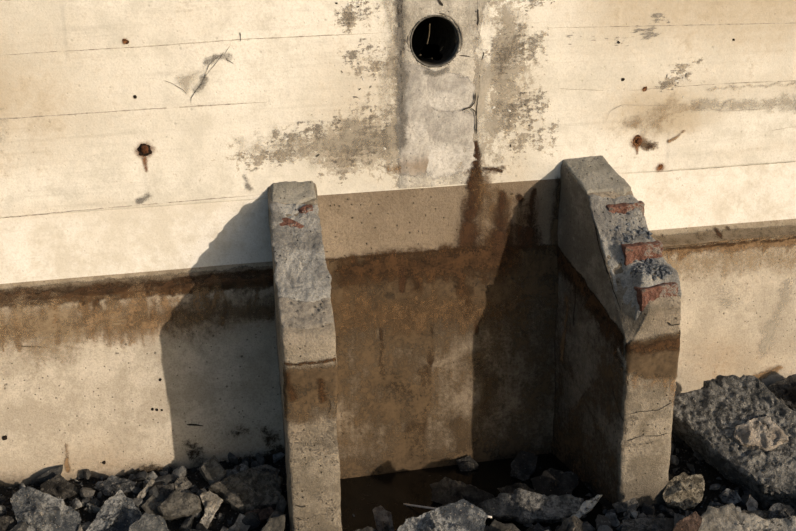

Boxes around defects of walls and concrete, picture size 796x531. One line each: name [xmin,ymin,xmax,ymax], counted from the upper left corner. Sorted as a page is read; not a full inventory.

peeling [485,0,559,153]
rust [631,136,658,151]
water stain [0,270,275,365]
water stain [283,177,681,504]
spalling [588,195,682,321]